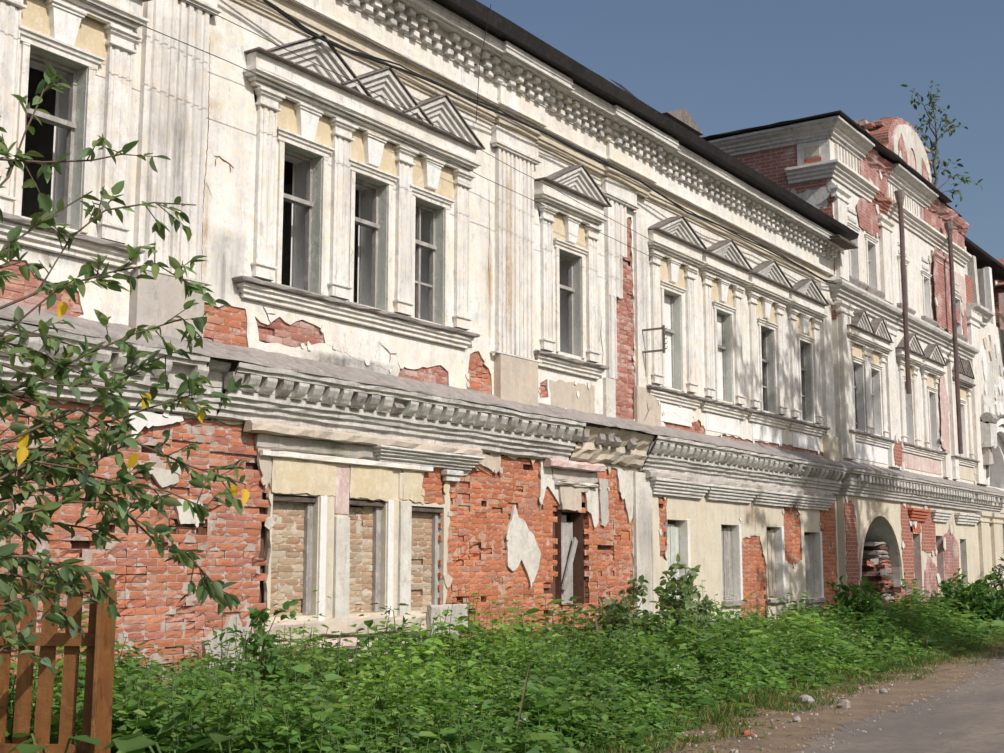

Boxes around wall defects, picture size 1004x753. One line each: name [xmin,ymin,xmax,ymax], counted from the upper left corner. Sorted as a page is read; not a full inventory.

flaking render [790,182,835,218]
flaking render [856,159,888,239]
flaking render [203,302,447,385]
flaking render [465,351,491,394]
flaking render [612,217,705,442]
flaking render [928,246,968,343]
flaking render [718,433,823,456]
spalling [0,397,276,710]
spalling [420,454,633,647]
spalling [782,507,804,568]
spalling [819,495,860,612]
flaking render [900,503,962,605]